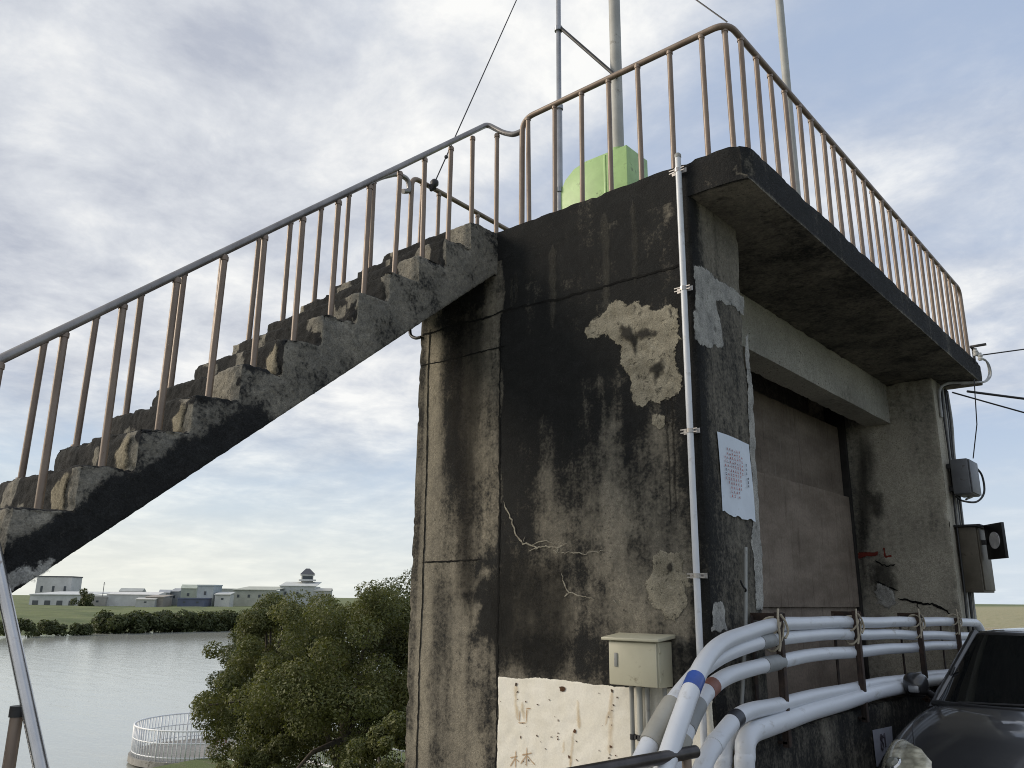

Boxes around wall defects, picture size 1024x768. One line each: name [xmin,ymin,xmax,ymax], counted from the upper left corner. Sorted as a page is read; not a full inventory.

peeling [693,266,744,348]
peeling [584,299,683,429]
damp [450,306,481,586]
crack [415,264,680,768]
damp [8,558,55,591]
peeling [645,550,693,622]
crack [898,598,950,614]